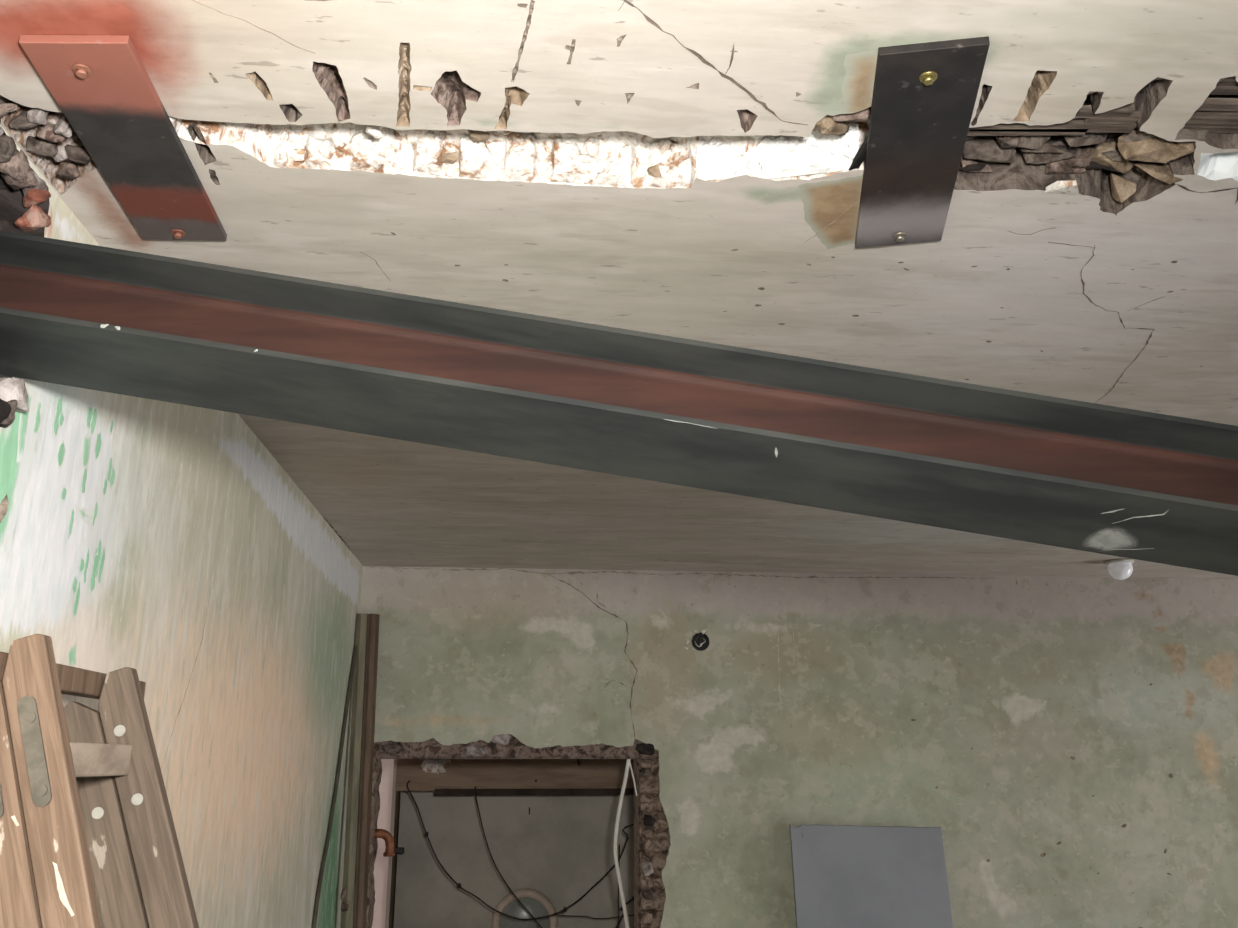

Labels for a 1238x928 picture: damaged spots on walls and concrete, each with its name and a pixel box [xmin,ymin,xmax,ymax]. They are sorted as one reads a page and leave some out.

spalling [0,95,99,246]
spalling [188,122,220,185]
spalling [246,72,302,122]
spalling [312,61,350,122]
crack [618,0,807,125]
spalling [737,109,757,133]
spalling [954,70,1238,215]
crack [1010,228,1163,403]
peeling [0,378,122,668]
crack [298,487,1066,738]
peeling [661,680,776,780]
spalling [366,734,670,928]